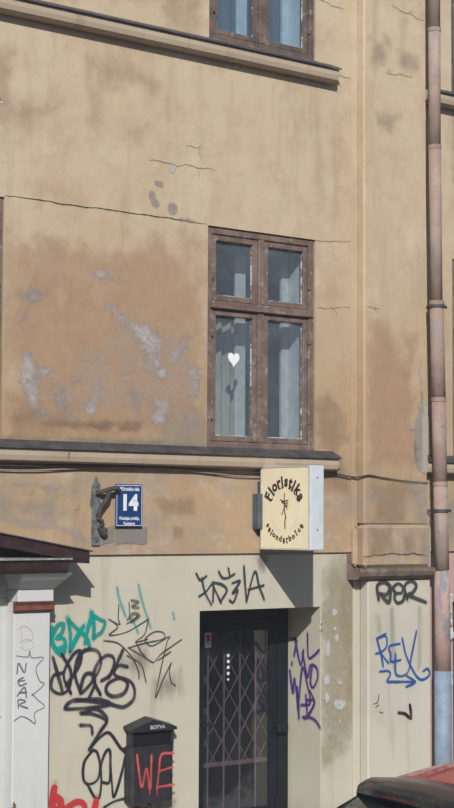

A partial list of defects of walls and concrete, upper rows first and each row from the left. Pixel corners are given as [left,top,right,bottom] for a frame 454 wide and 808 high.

crack [155,143,215,178]
peeling [149,181,194,222]
peeling [106,305,187,380]
peeling [19,354,51,415]
peeling [323,675,345,736]